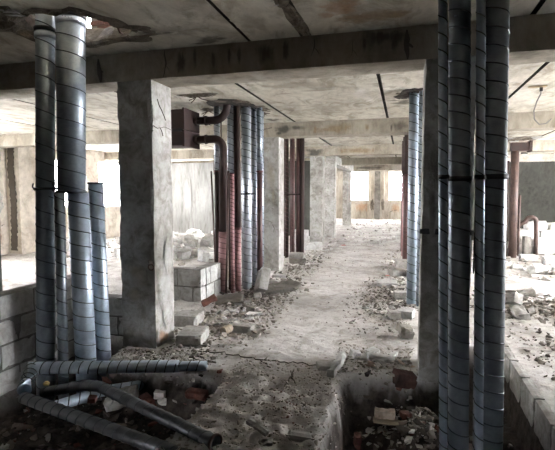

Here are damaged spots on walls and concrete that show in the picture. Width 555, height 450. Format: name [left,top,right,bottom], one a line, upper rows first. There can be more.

spalling [0,6,156,48]
damp [155,26,242,76]
damp [230,11,290,70]
crack [197,350,316,391]